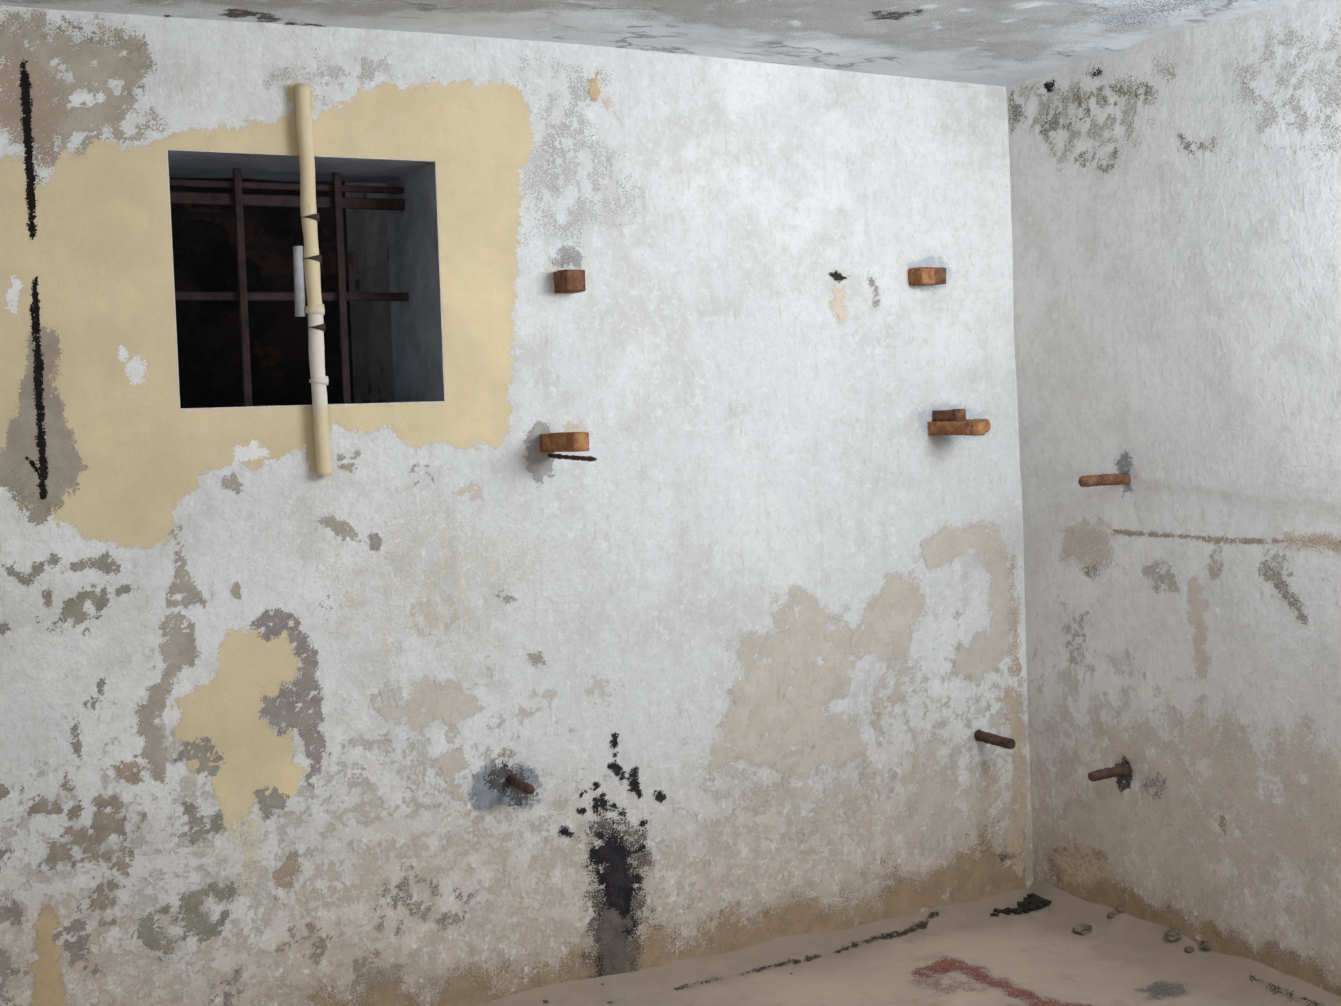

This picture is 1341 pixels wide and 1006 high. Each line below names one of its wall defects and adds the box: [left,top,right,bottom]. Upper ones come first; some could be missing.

crack [19,59,38,240]
crack [25,276,50,502]
peeling [0,76,597,1006]
leakage [305,696,1341,1006]
corrosion [977,554,1029,887]